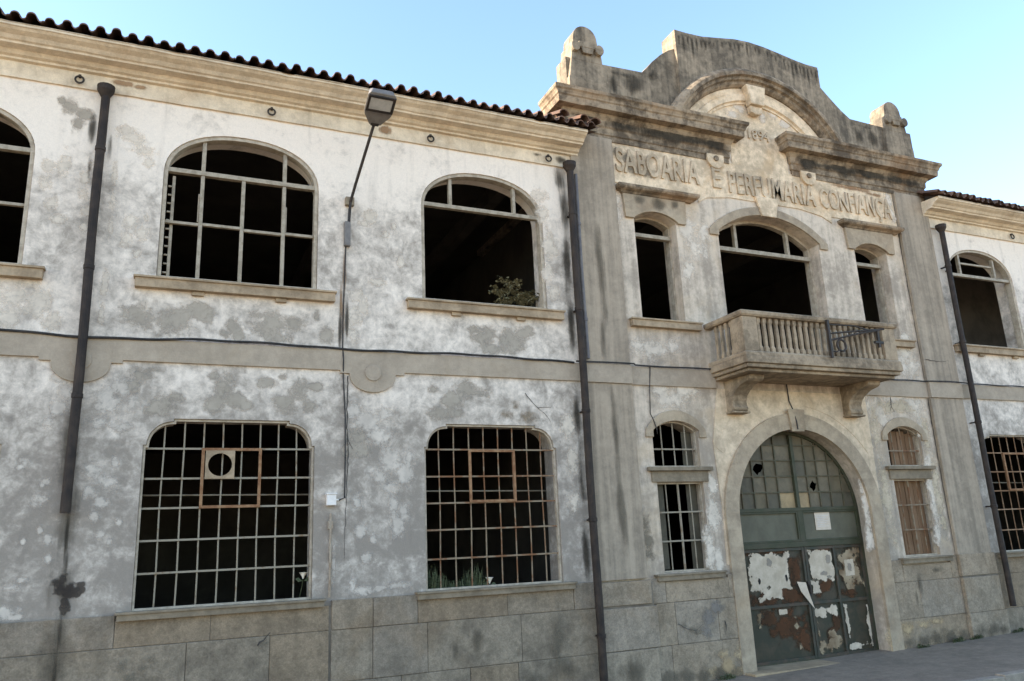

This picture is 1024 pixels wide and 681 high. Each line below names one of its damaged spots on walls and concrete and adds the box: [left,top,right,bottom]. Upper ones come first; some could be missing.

damp [557,157,568,223]
peeling [702,473,724,570]
peeling [858,479,875,549]
damp [51,513,85,681]